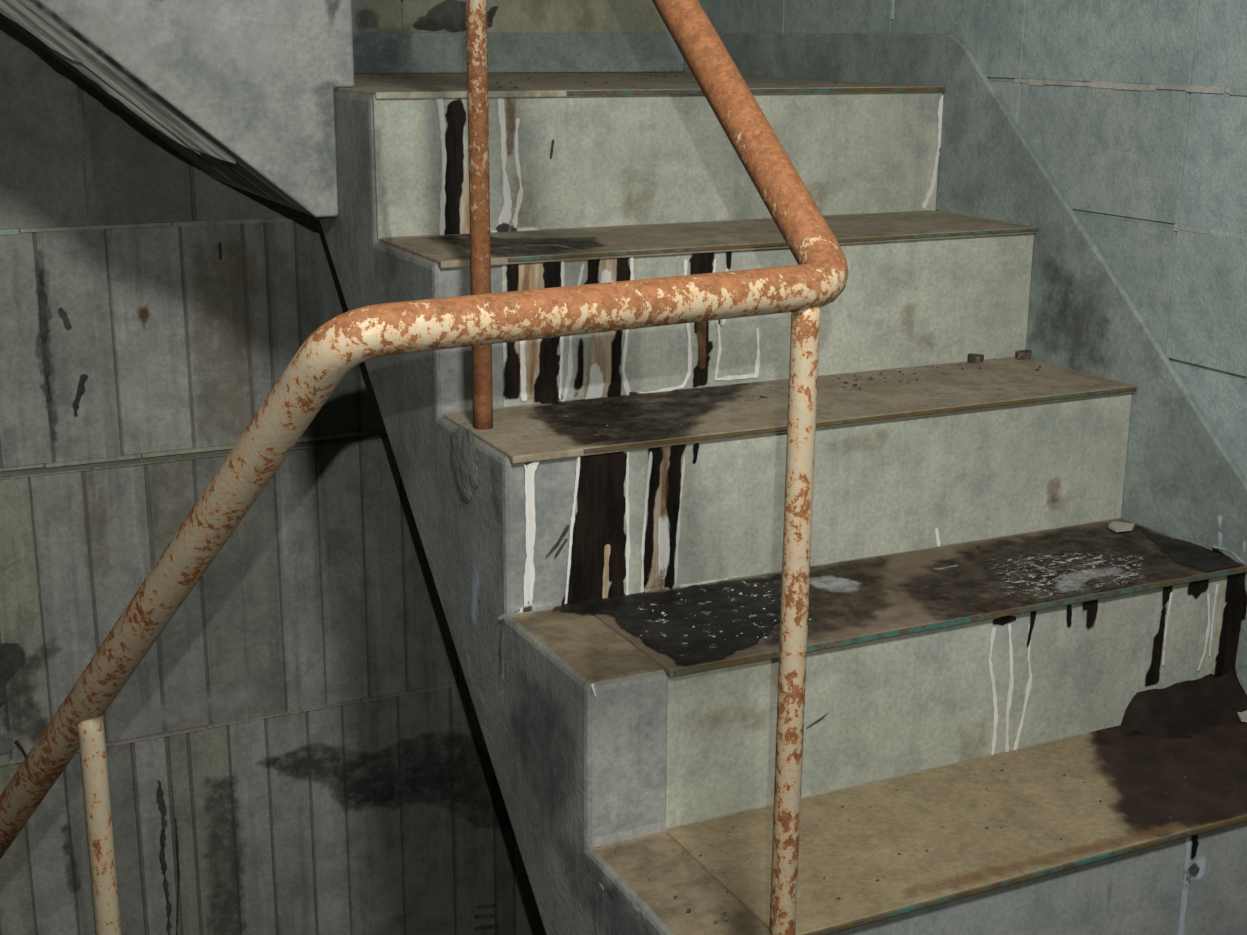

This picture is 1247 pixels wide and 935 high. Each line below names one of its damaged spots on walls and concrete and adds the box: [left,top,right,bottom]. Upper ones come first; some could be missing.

water stain [666,251,732,277]
water stain [503,319,782,665]
water stain [808,559,886,632]
water stain [900,516,1247,686]
water stain [989,620,1047,755]
water stain [1092,723,1247,935]